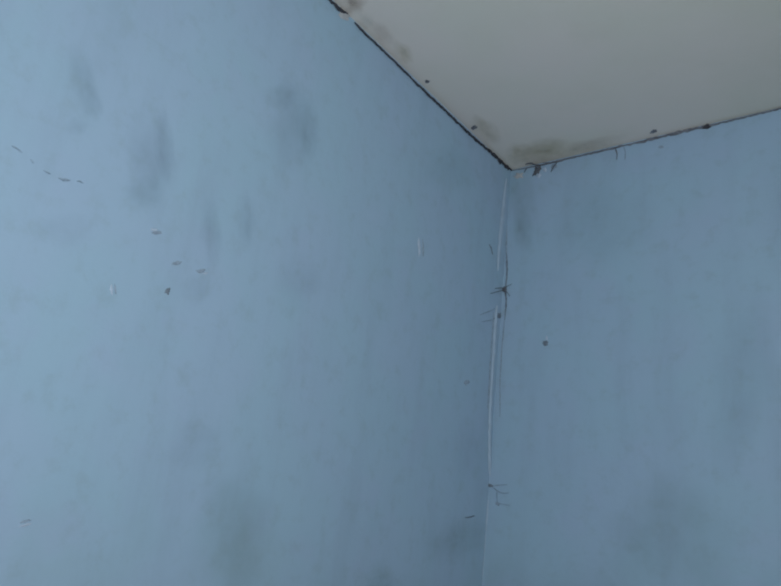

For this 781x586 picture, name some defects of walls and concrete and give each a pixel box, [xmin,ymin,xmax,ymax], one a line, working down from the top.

crack [329,0,781,476]